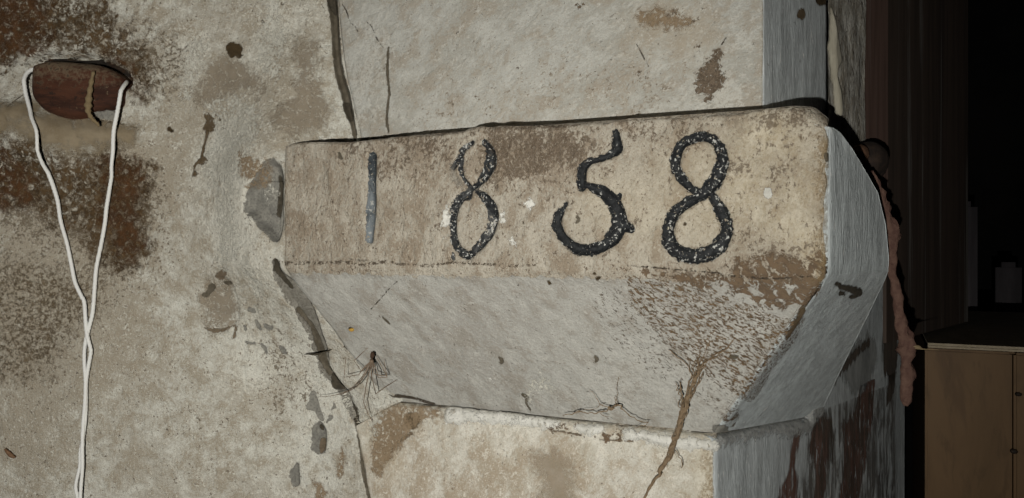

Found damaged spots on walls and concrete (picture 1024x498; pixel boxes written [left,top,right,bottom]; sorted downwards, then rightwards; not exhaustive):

water stain [0,0,188,106]
crack [327,0,391,141]
water stain [0,133,159,275]
water stain [0,256,107,376]
peeling [595,245,828,433]